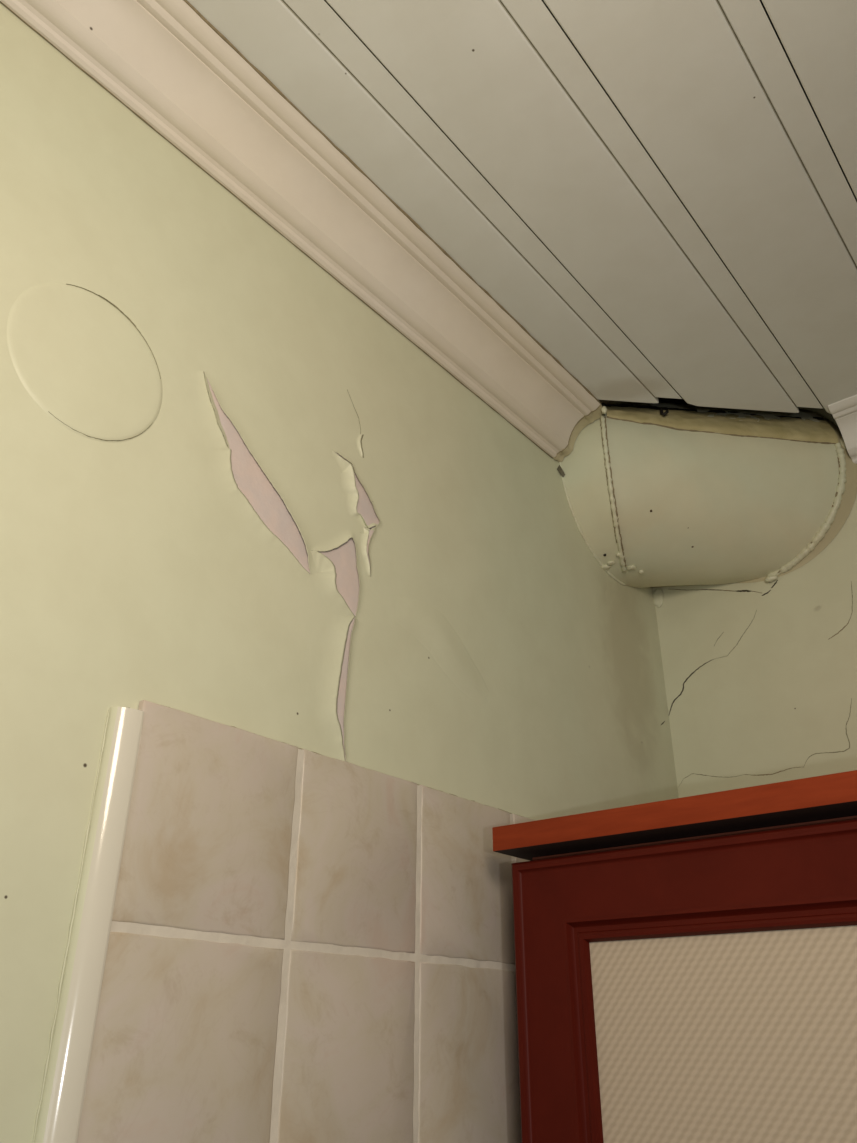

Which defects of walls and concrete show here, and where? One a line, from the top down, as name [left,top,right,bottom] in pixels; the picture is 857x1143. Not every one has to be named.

crack [661,580,778,725]
crack [828,582,853,640]
crack [679,698,852,786]